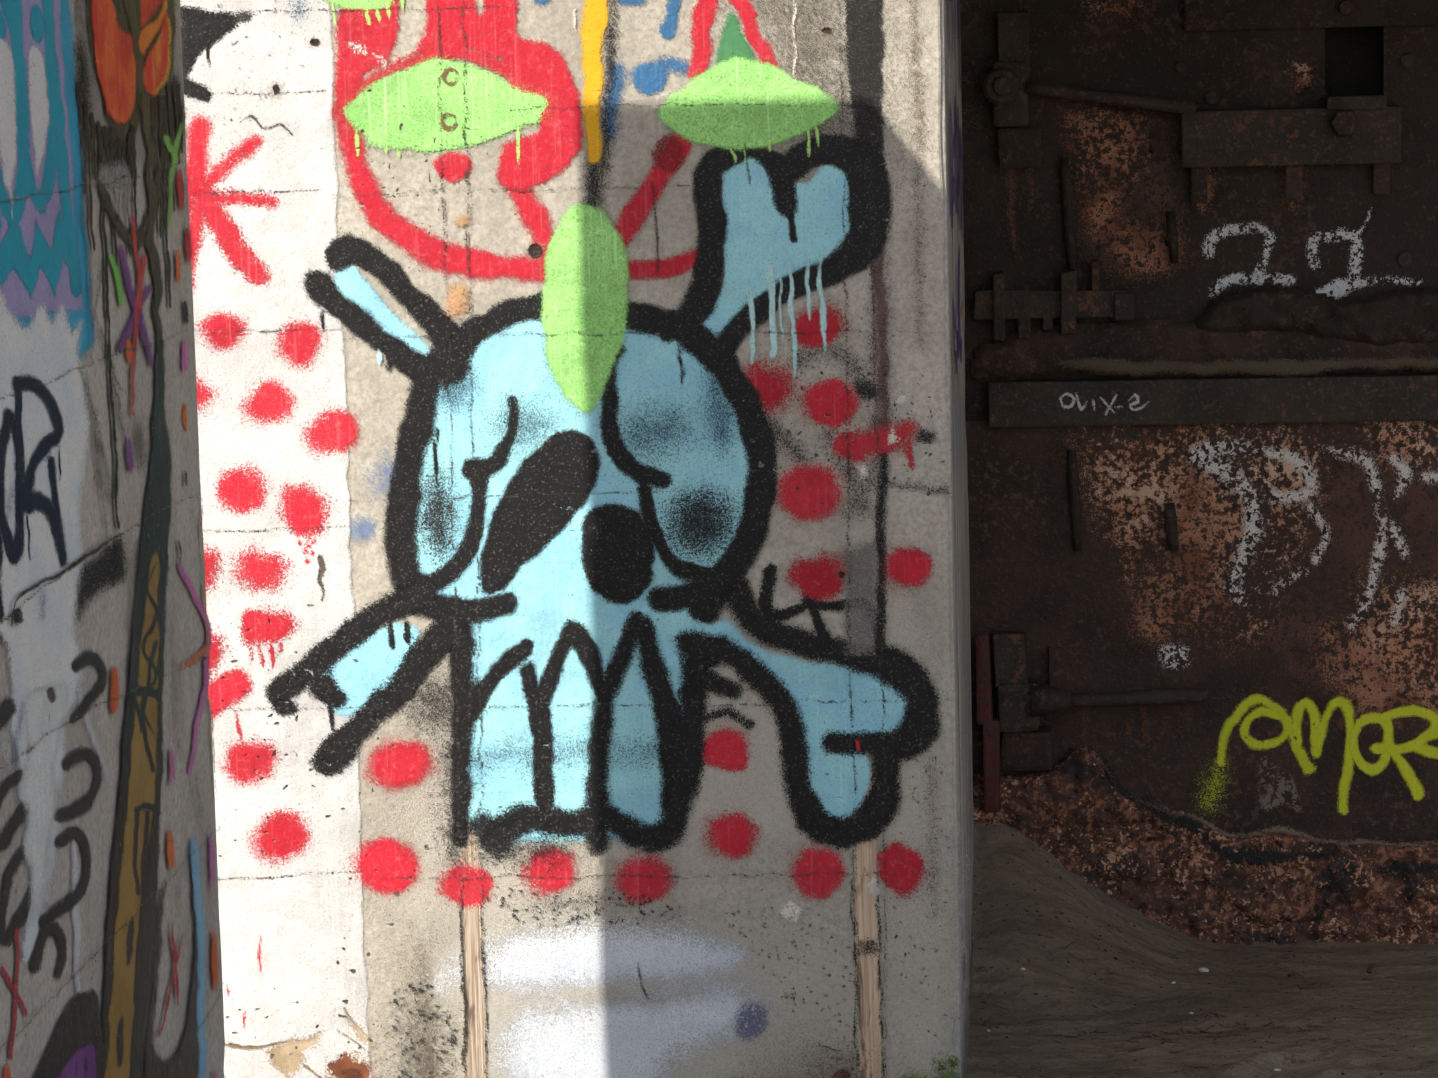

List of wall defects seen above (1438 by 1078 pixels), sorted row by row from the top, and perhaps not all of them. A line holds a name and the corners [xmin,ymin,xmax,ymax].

rust [1279,58,1316,93]
rust [1047,99,1216,293]
rust [1048,421,1438,746]